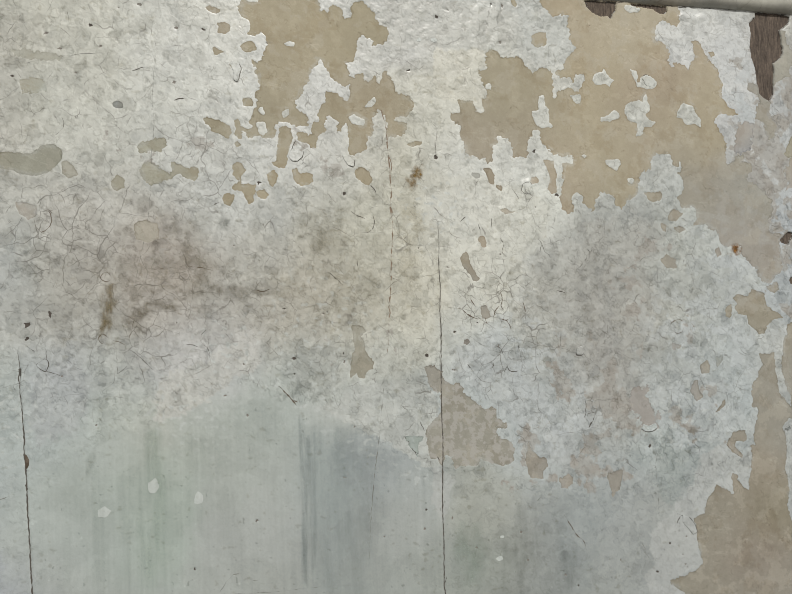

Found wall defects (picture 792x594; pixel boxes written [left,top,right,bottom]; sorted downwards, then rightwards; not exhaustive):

peeling [0,144,78,178]
peeling [203,0,414,206]
crack [0,349,60,594]
crack [408,258,447,594]
peeling [405,354,515,469]
crack [459,291,526,328]
peeling [450,0,792,594]